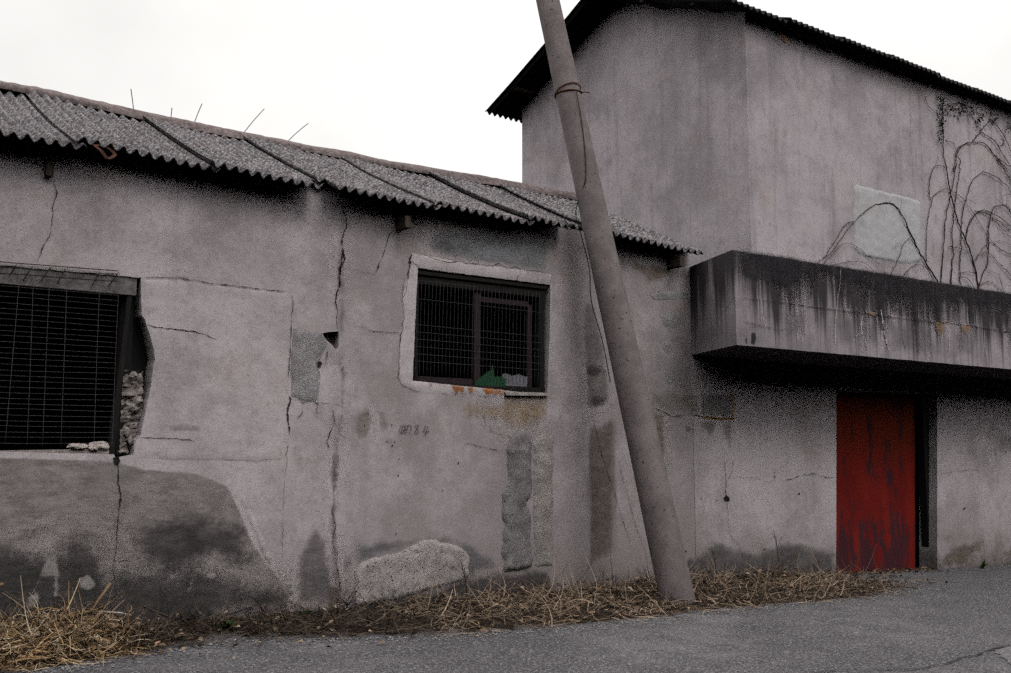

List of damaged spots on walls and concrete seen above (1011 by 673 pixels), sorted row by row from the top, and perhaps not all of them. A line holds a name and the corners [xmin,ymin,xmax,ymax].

crack [36,177,58,263]
crack [335,200,543,392]
water stain [743,252,1011,350]
spalling [113,370,144,465]
crack [144,277,338,554]
corrosion [453,386,504,395]
crack [113,467,129,592]
water stain [0,458,288,629]
water stain [301,535,347,605]
crack [332,487,341,588]